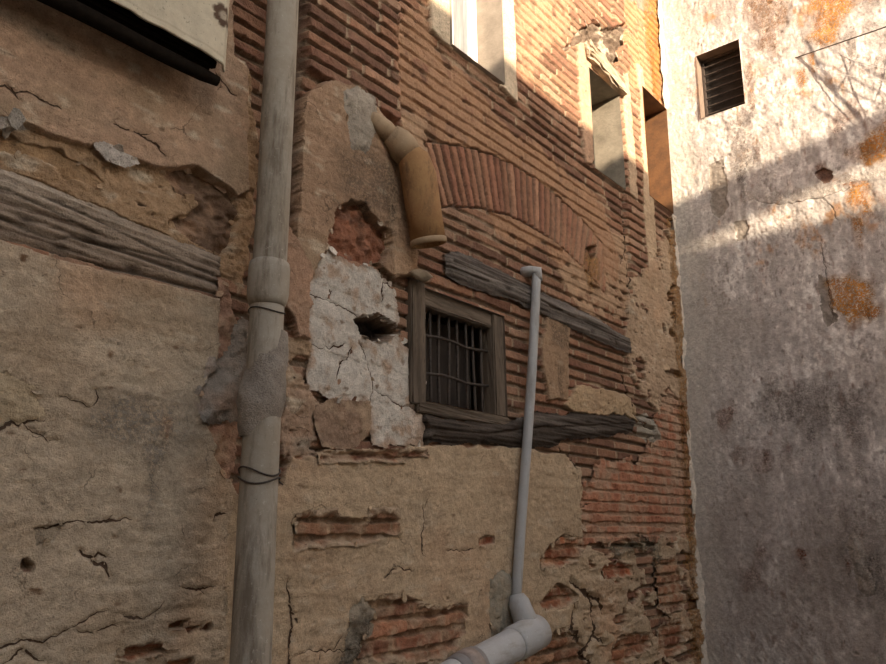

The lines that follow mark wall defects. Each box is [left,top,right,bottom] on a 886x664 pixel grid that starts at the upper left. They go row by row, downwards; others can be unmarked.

rust [797,0,853,88]
flaking render [94,141,140,168]
rust [860,123,886,165]
spalling [164,168,238,257]
rust [825,275,881,323]
peeling [305,204,433,464]
crack [35,515,132,529]
flaking render [291,505,403,552]
crack [79,549,110,577]
crack [0,602,164,664]
crack [286,580,355,664]
spalling [353,590,469,664]